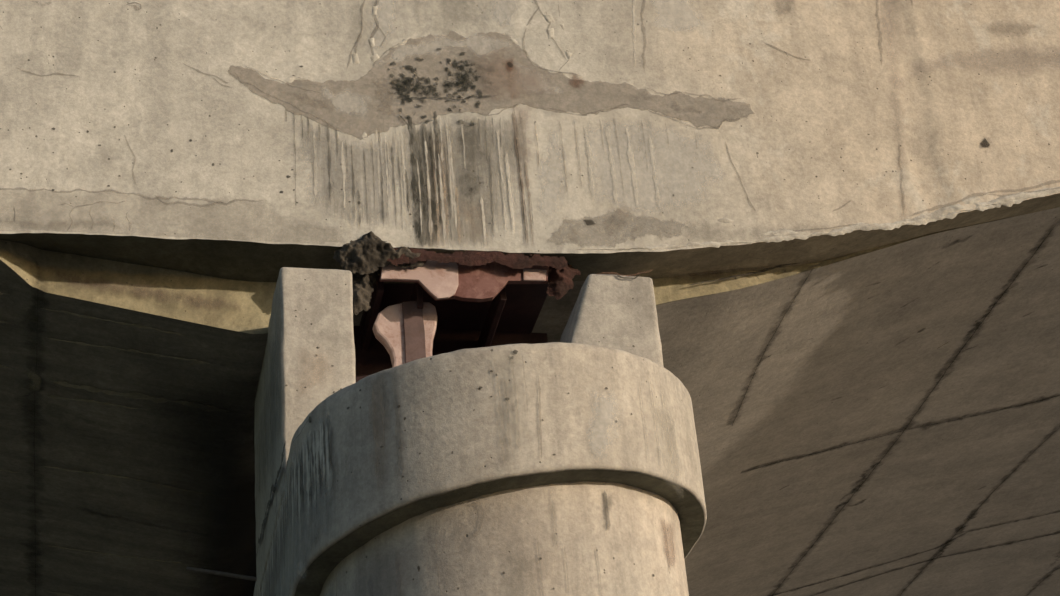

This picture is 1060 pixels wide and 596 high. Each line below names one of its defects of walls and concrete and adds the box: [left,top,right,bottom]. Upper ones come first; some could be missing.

crack [352,5,380,65]
spalling [228,32,754,140]
crack [542,14,572,59]
water stain [294,48,514,242]
spalling [333,187,1060,315]
crack [689,263,797,285]